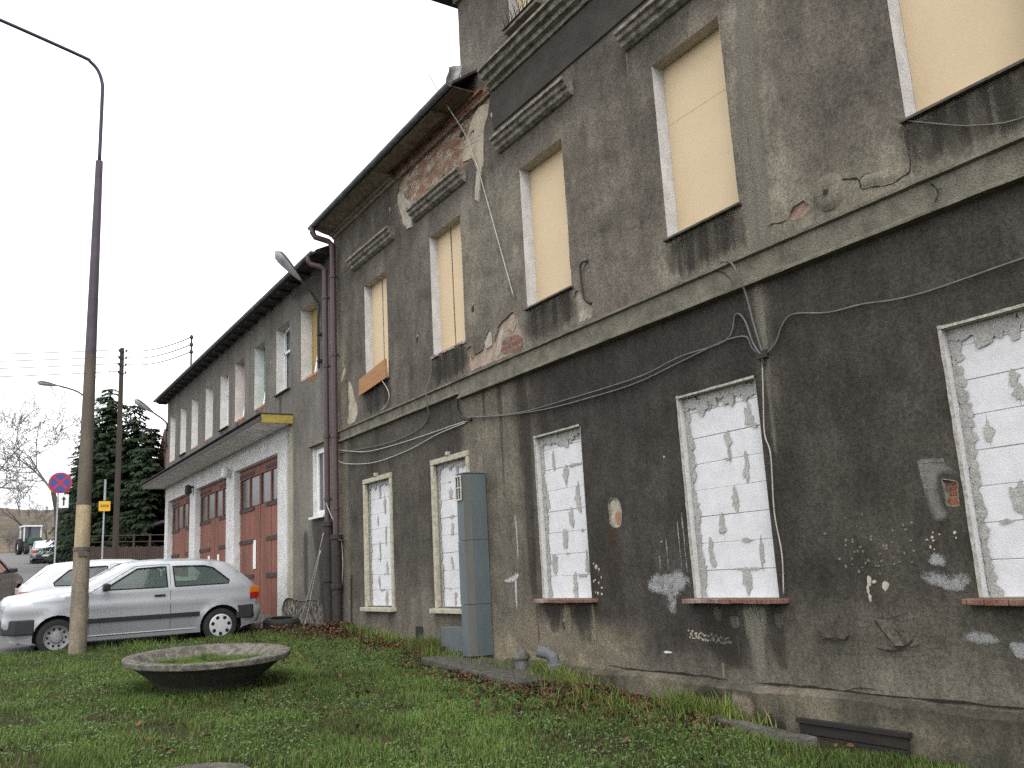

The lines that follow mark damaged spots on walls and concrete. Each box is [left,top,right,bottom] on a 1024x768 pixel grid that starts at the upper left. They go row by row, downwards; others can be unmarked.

spalling [389,93,492,229]
crack [842,157,944,203]
spalling [788,199,809,221]
spalling [467,311,526,373]
spalling [608,498,622,528]
spalling [918,458,960,550]
crack [874,613,913,652]
crack [608,665,725,680]
crack [754,682,1024,710]